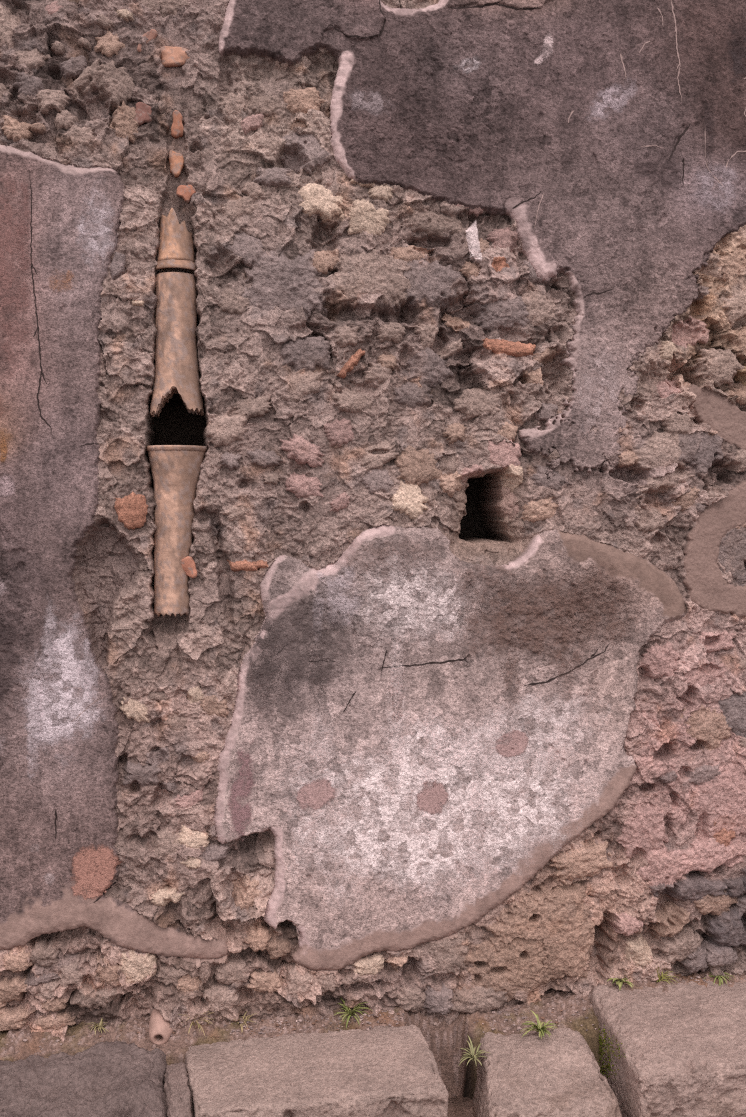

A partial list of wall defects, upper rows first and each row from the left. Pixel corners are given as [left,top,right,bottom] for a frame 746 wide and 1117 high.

crack [29,174,52,434]
spalling [0,0,618,939]
spalling [559,226,746,859]